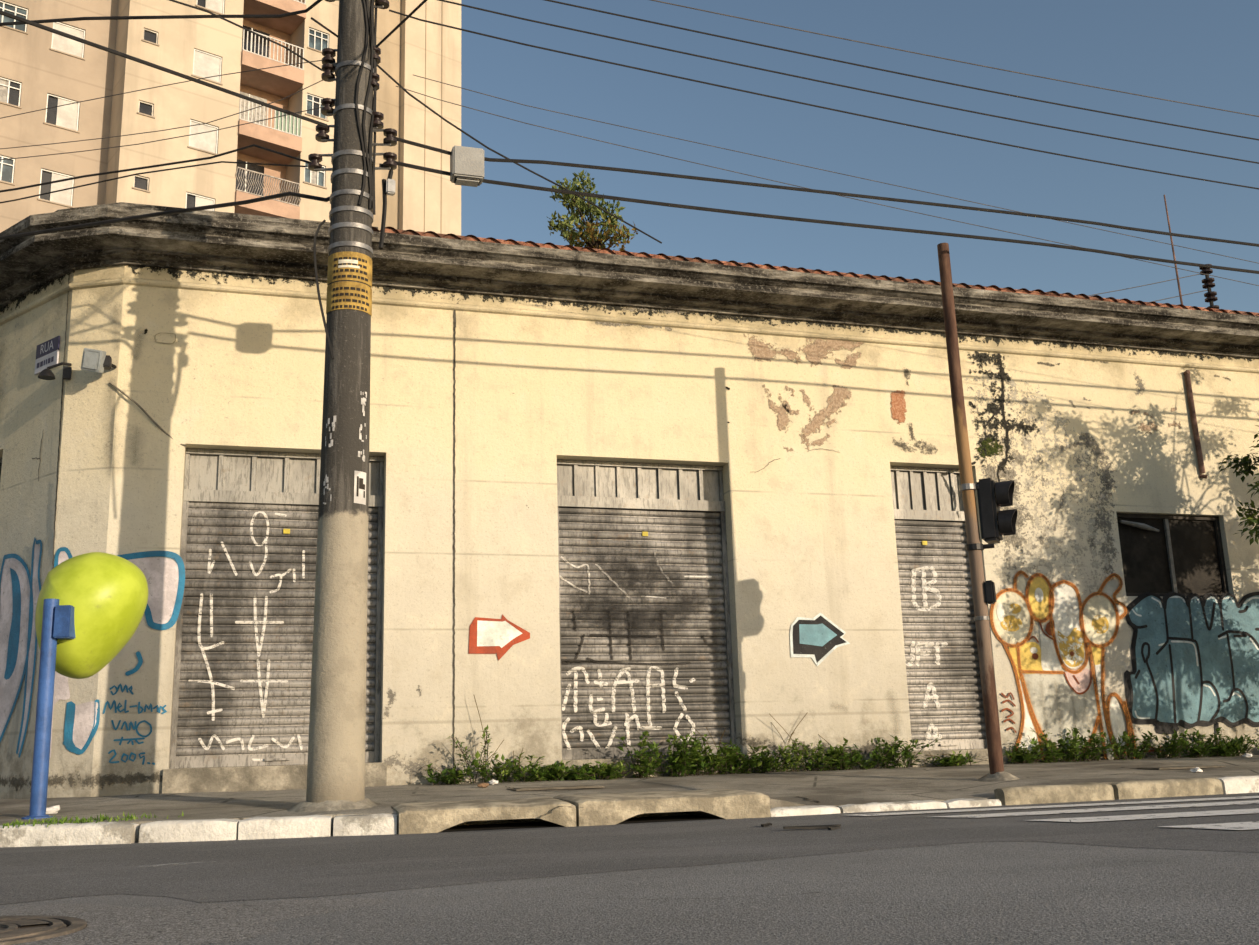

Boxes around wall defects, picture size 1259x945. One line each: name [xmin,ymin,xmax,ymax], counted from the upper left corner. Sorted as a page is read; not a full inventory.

leakage [127,265,327,287]
peeling [743,334,864,369]
peeling [762,385,851,452]
leakage [372,285,1255,476]
flaking render [890,390,907,425]
leakage [1059,433,1117,580]